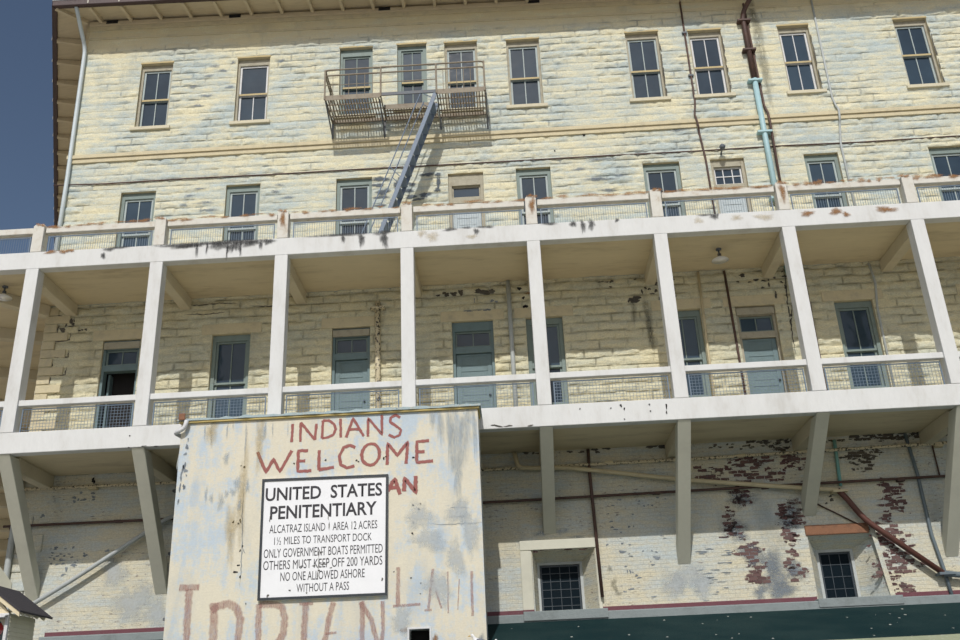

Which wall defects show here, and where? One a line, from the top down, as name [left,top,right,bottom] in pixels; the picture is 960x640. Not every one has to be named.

peeling [371,173,441,206]
peeling [436,288,498,312]
peeling [628,278,660,303]
peeling [693,438,809,601]
peeling [826,432,926,593]
damp [725,522,802,597]